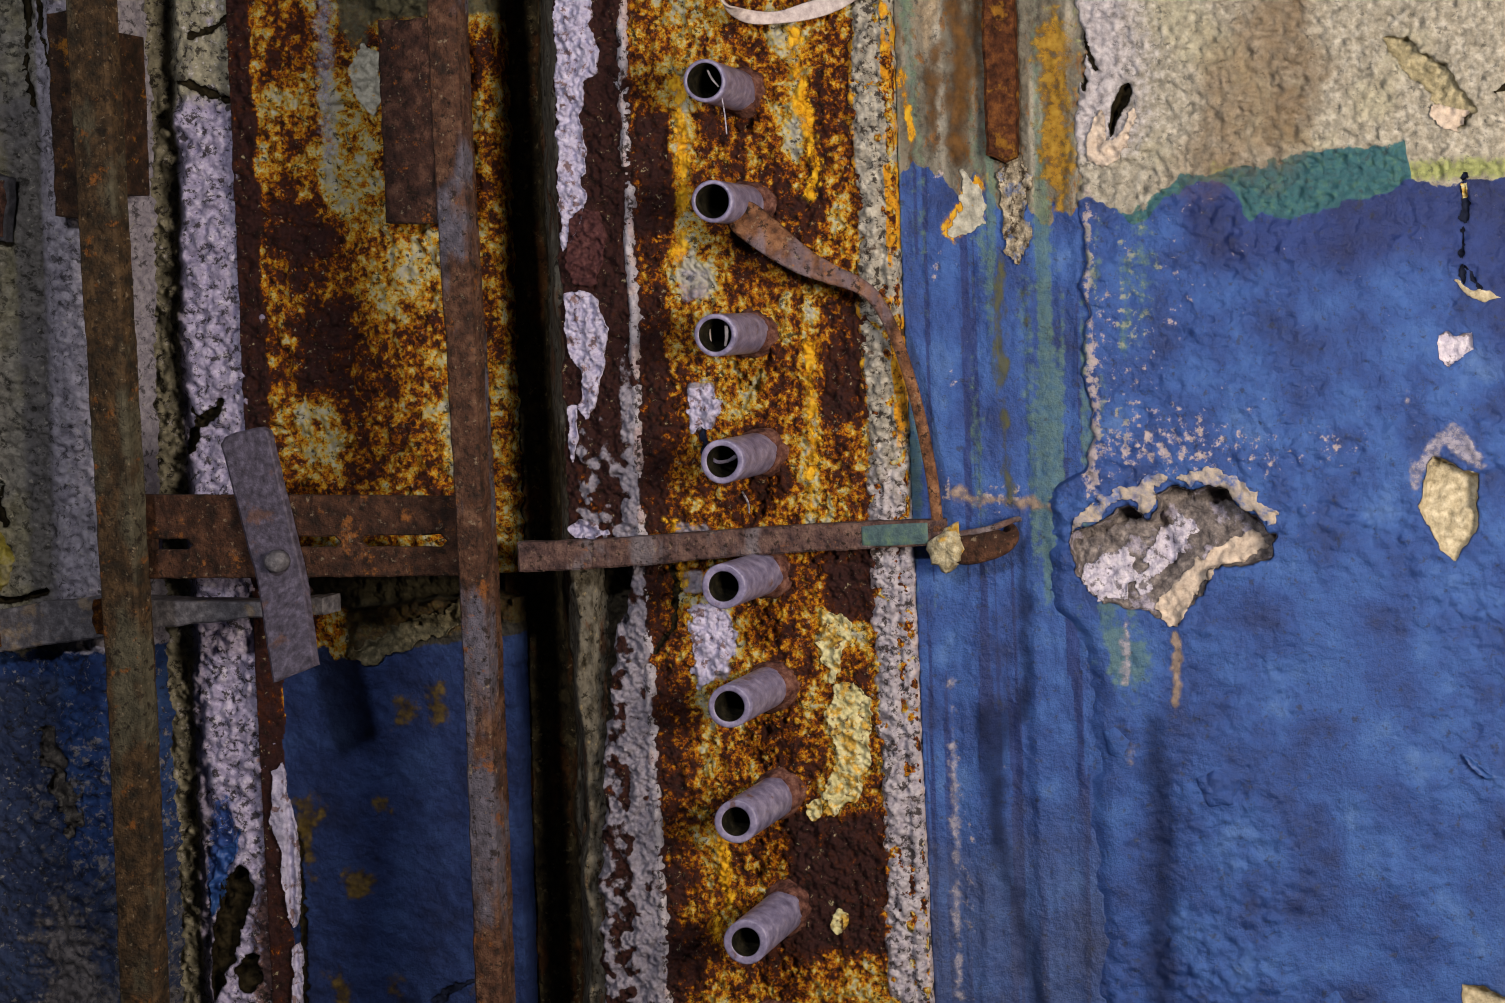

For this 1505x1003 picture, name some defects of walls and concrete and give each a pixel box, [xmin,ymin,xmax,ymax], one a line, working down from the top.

crack [22,0,49,107]
corrosion [226,0,455,496]
corrosion [668,74,693,265]
corrosion [787,25,824,201]
spalling [1086,108,1137,168]
corrosion [468,0,538,1003]
corrosion [798,342,821,514]
spalling [1069,466,1279,627]
spalling [1418,456,1478,561]
peeling [208,829,241,918]
corrosion [253,576,476,1003]
spalling [1462,984,1505,1003]